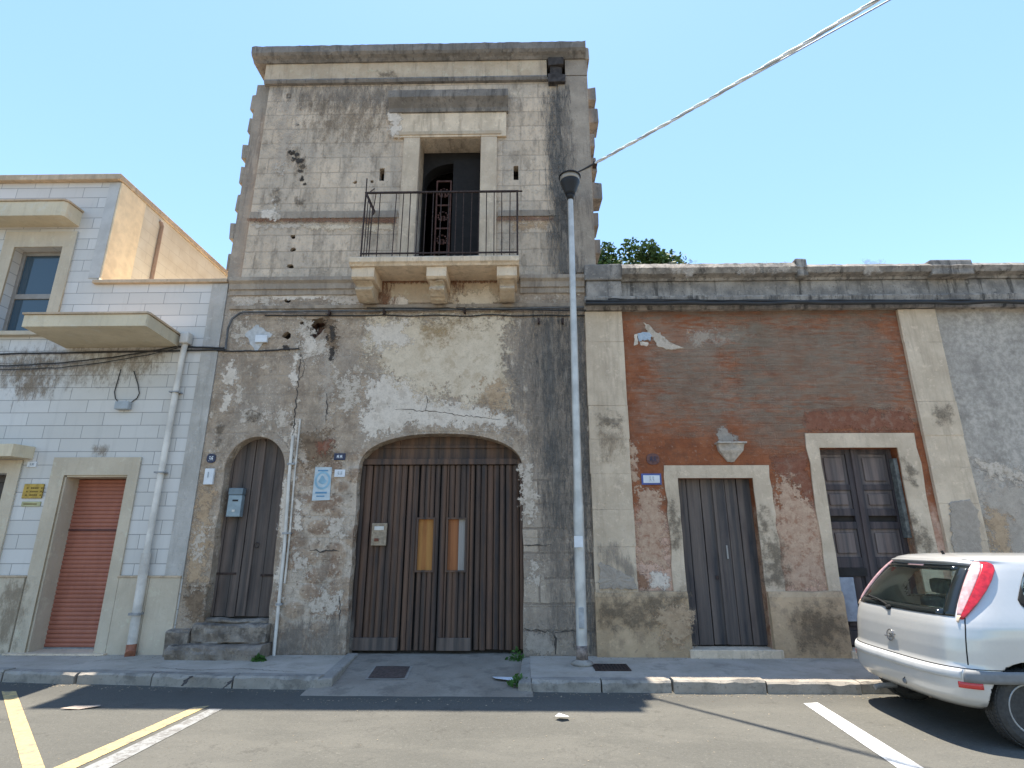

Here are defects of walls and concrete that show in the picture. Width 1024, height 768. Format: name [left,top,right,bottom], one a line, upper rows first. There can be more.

water stain [541,86,576,274]
peeling [634,322,684,350]
crack [288,349,305,460]
peeling [217,285,532,625]
crack [395,396,499,420]
spalling [516,463,541,525]
water stain [503,314,683,655]
peeling [629,440,671,591]
peeling [769,450,828,591]
spalling [949,499,1016,553]
spalling [525,628,555,656]